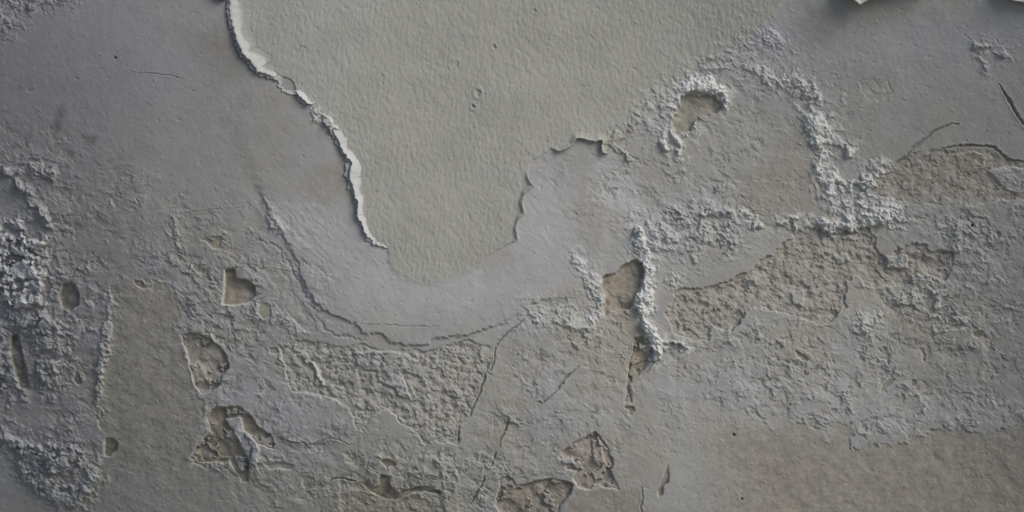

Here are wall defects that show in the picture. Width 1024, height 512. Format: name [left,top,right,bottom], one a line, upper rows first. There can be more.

water stain [0,162,56,309]
spalling [221,268,273,321]
peeling [226,0,782,283]
spalling [524,258,647,333]
water stain [572,0,936,363]
spalling [664,142,1024,344]
crack [892,122,1024,166]
flaking render [0,279,277,512]
spalling [270,338,500,449]
crack [457,318,526,448]
spalling [625,335,655,414]
spalling [493,430,621,512]